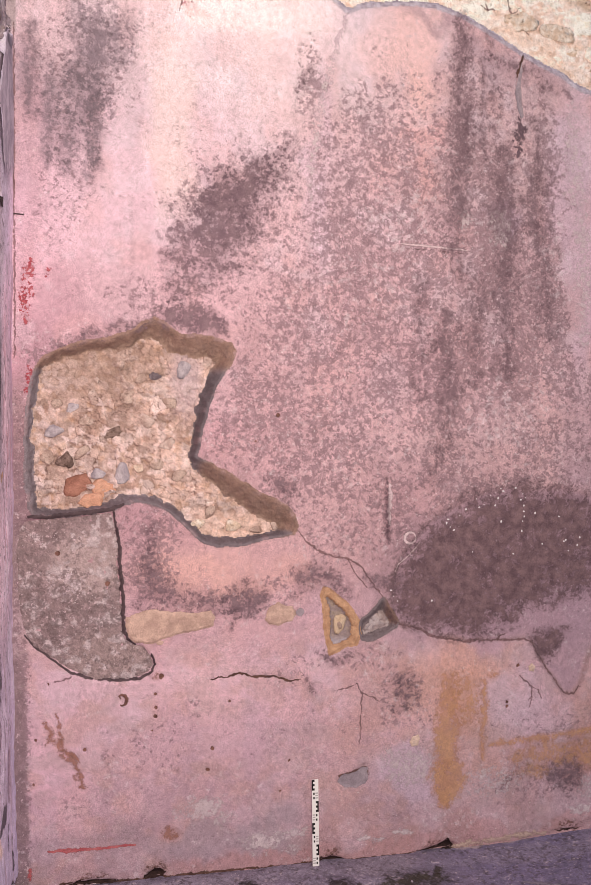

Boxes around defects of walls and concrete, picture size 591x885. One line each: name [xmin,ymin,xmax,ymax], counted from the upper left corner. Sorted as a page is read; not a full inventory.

leakage [24,21,36,106]
leakage [60,134,298,347]
leakage [449,187,472,254]
flaking render [16,316,299,682]
leakage [293,563,349,594]
crack [299,531,383,597]
leakage [363,480,591,642]
crack [211,672,301,682]
flaking render [320,586,399,656]
leakage [531,625,569,665]
crack [334,683,378,742]
rust [42,714,86,789]